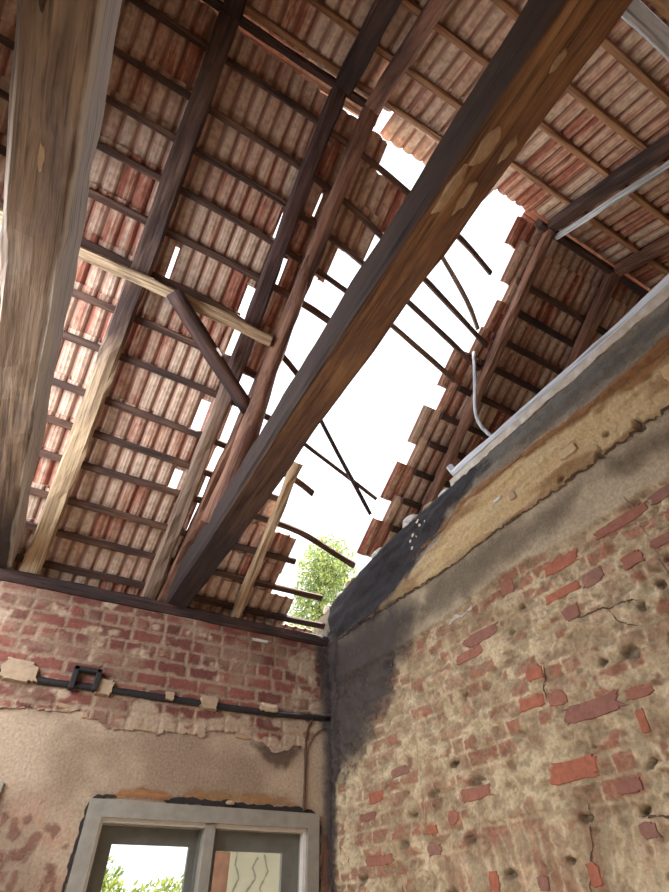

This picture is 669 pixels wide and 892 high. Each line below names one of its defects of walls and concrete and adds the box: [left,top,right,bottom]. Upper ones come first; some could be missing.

crack [338,405,669,640]
flaking render [593,484,669,571]
flaking render [543,548,581,578]
flaking render [546,565,605,622]
spalling [0,581,323,753]
flaking render [456,622,498,666]
flaking render [518,683,655,733]
water stain [256,745,297,767]
flaking render [549,753,600,786]
flaking render [448,783,494,825]
crack [642,813,669,821]
peeling [0,813,60,892]